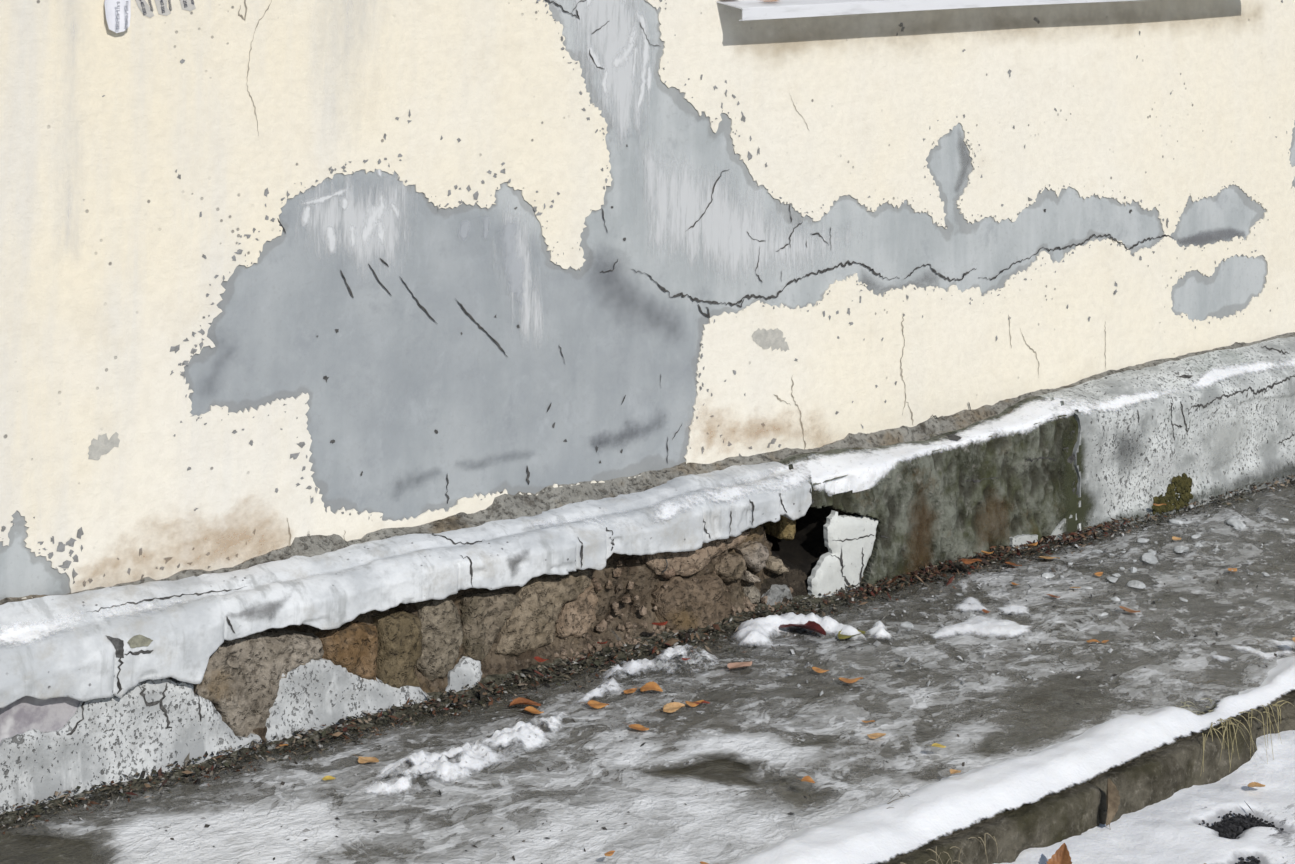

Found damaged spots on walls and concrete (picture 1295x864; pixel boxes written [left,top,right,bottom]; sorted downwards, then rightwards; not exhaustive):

crack [238,0,272,136]
peeling [1275,122,1295,188]
crack [600,206,1173,318]
peeling [170,0,1269,744]
crack [900,317,938,424]
crack [1009,317,1039,378]
peeling [88,432,120,460]
peeling [117,547,211,579]